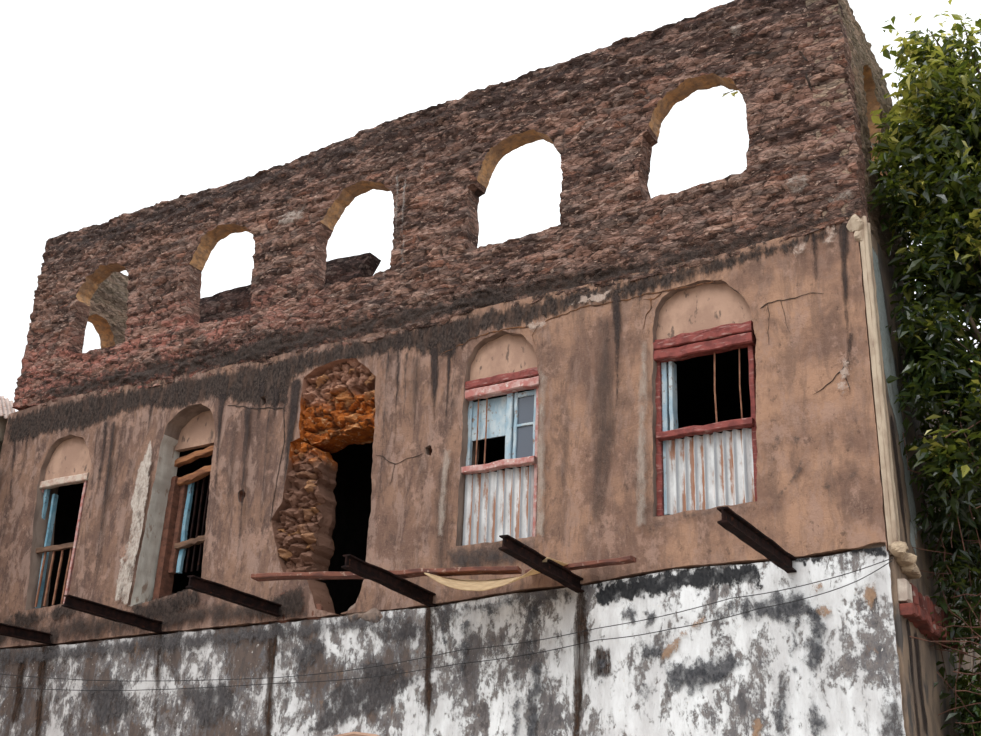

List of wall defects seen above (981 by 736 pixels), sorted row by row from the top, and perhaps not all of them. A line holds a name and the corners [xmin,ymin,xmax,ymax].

crack [760,292,822,337]
spalling [301,359,376,454]
water stain [0,208,854,515]
crack [816,360,850,393]
water stain [0,588,423,677]
water stain [303,658,418,734]
water stain [436,589,571,736]
water stain [641,636,739,696]
water stain [596,564,827,675]
water stain [770,676,791,732]
water stain [808,705,826,736]
water stain [878,693,903,736]